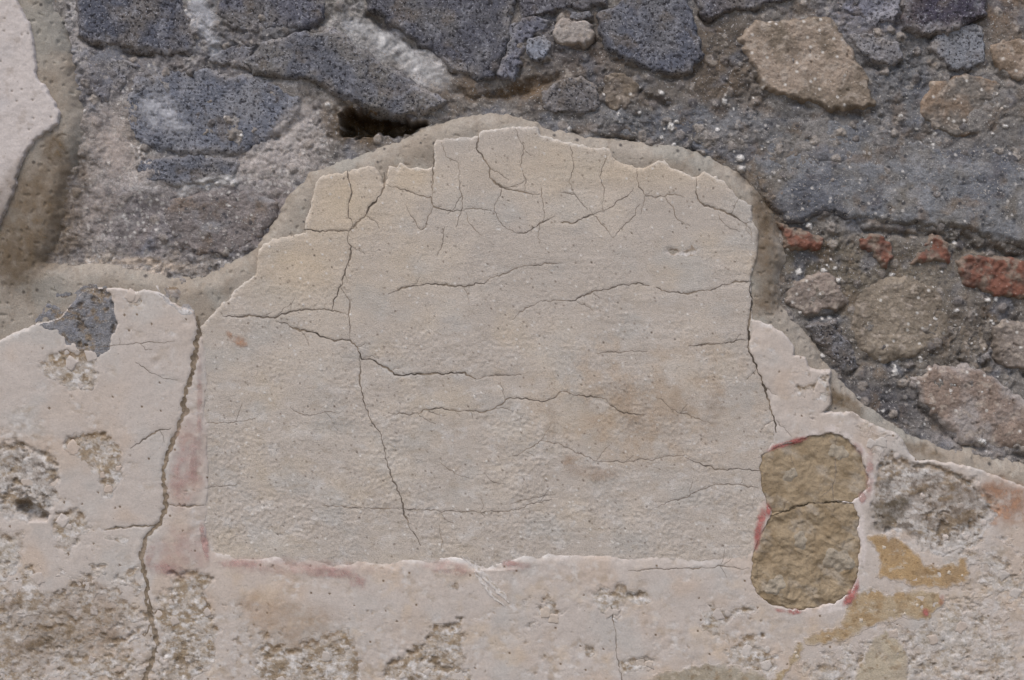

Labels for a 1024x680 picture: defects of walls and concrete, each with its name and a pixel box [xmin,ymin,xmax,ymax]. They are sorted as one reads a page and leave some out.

spalling [0,429,130,583]
flaking render [34,283,142,398]
crack [101,130,764,680]
crack [512,280,846,516]
spalling [618,433,1000,680]
spalling [791,365,831,419]